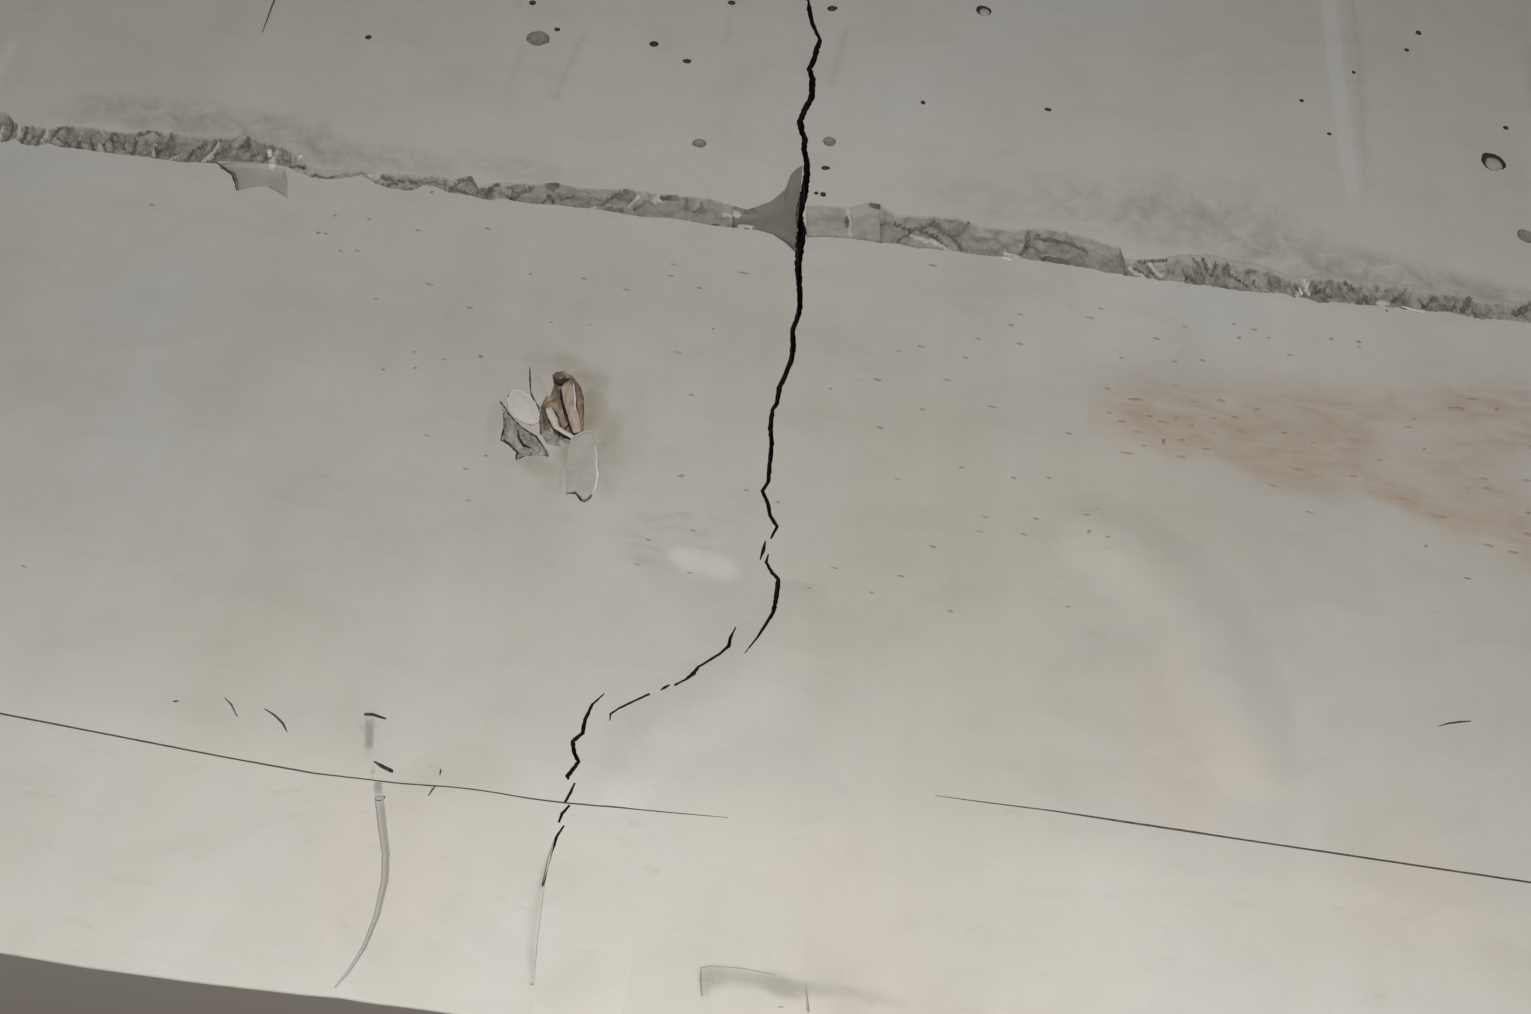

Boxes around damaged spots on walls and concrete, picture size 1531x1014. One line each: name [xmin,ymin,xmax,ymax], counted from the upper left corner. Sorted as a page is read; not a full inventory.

spalling [217,149,288,199]
spalling [733,165,803,252]
crack [0,0,822,985]
spalling [469,336,673,513]
corrosion [1028,327,1531,603]